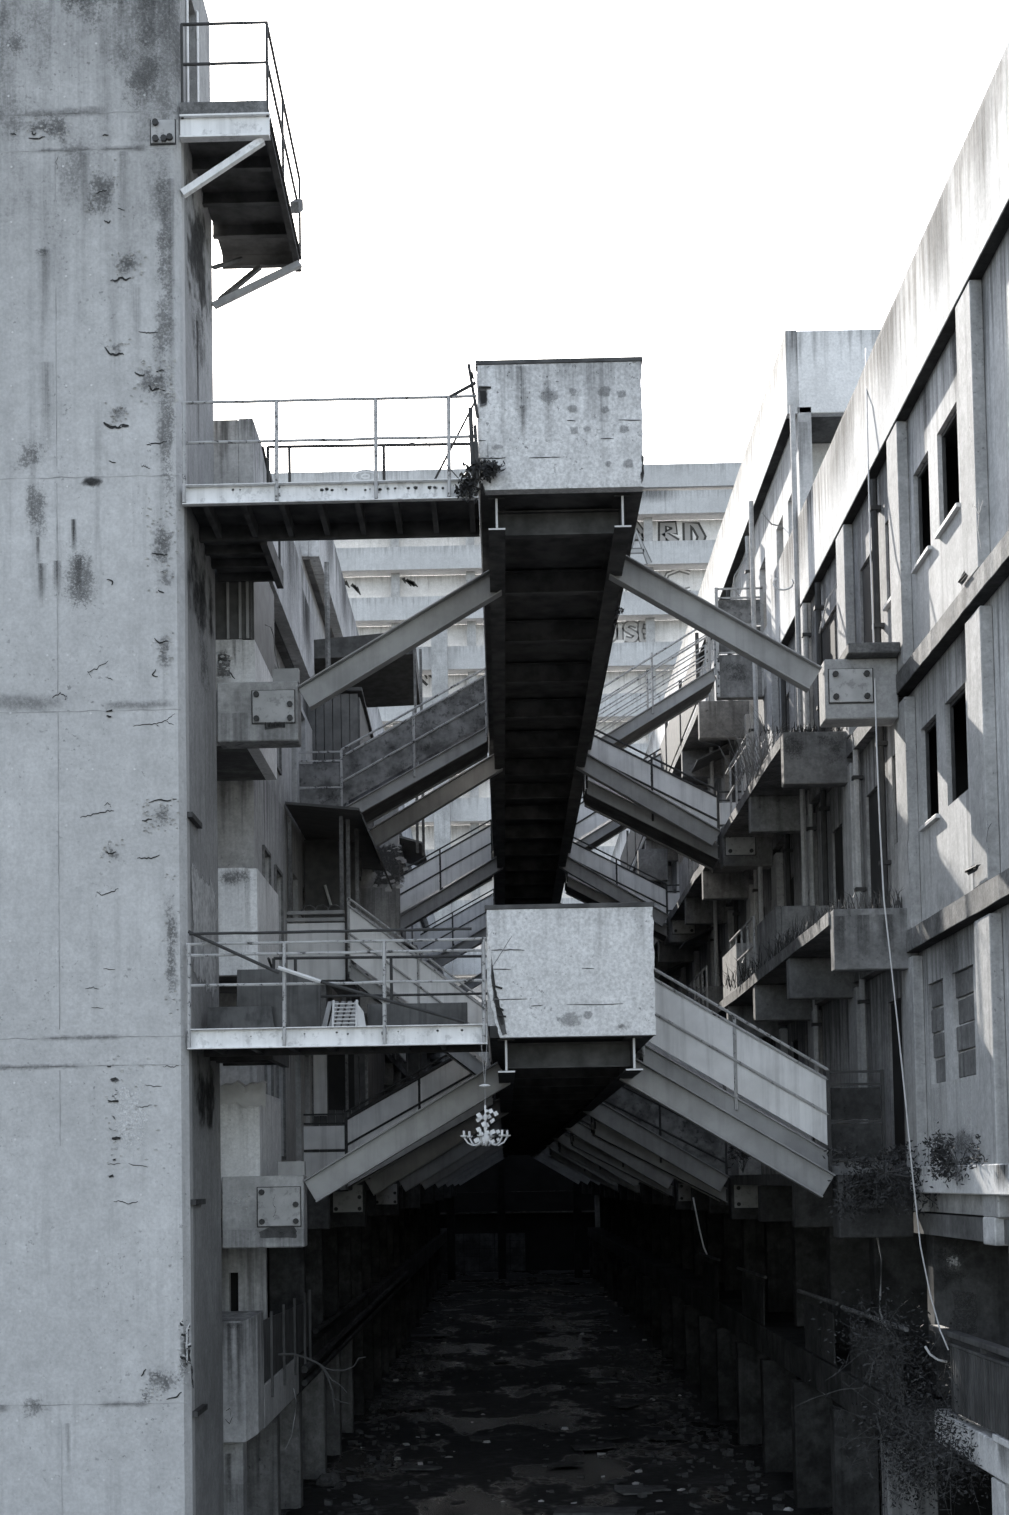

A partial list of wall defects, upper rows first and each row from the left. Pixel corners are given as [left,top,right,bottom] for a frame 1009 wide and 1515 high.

damp [40,557,90,598]